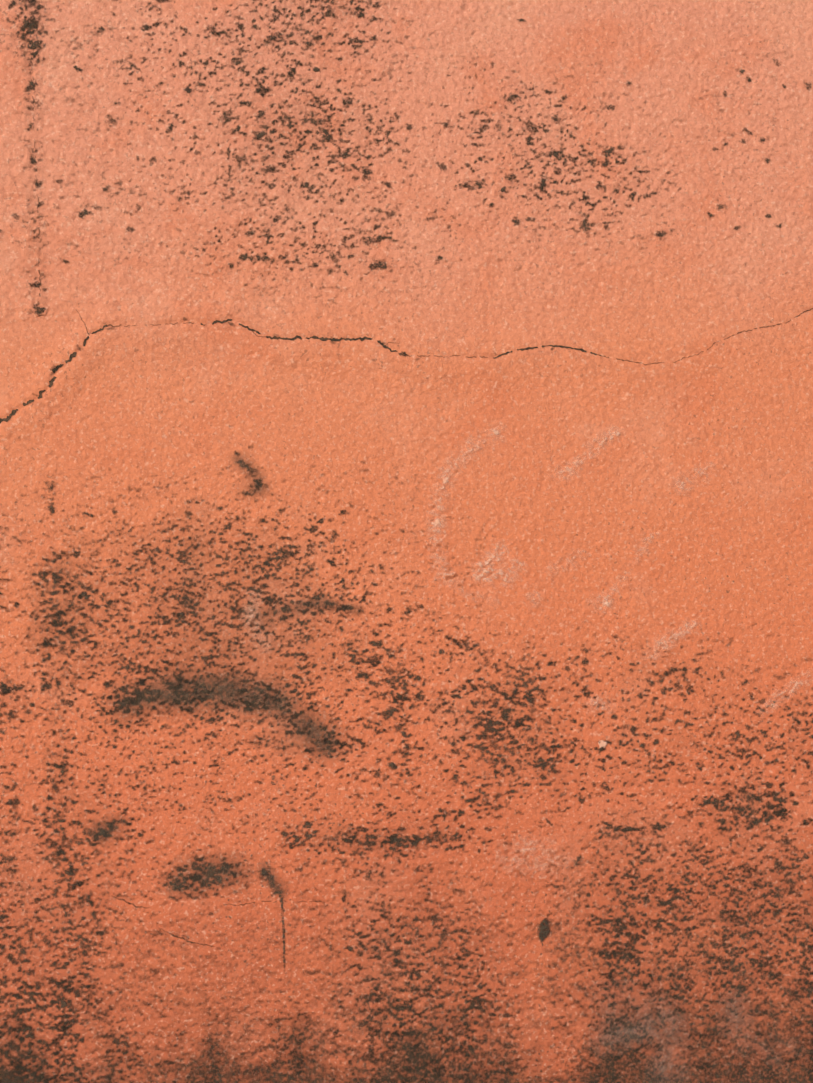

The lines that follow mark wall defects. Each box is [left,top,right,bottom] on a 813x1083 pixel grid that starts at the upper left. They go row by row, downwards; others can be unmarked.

water stain [179,0,412,275]
mould [459,88,657,234]
crack [0,319,135,423]
crack [173,308,813,365]
water stain [0,499,813,1083]